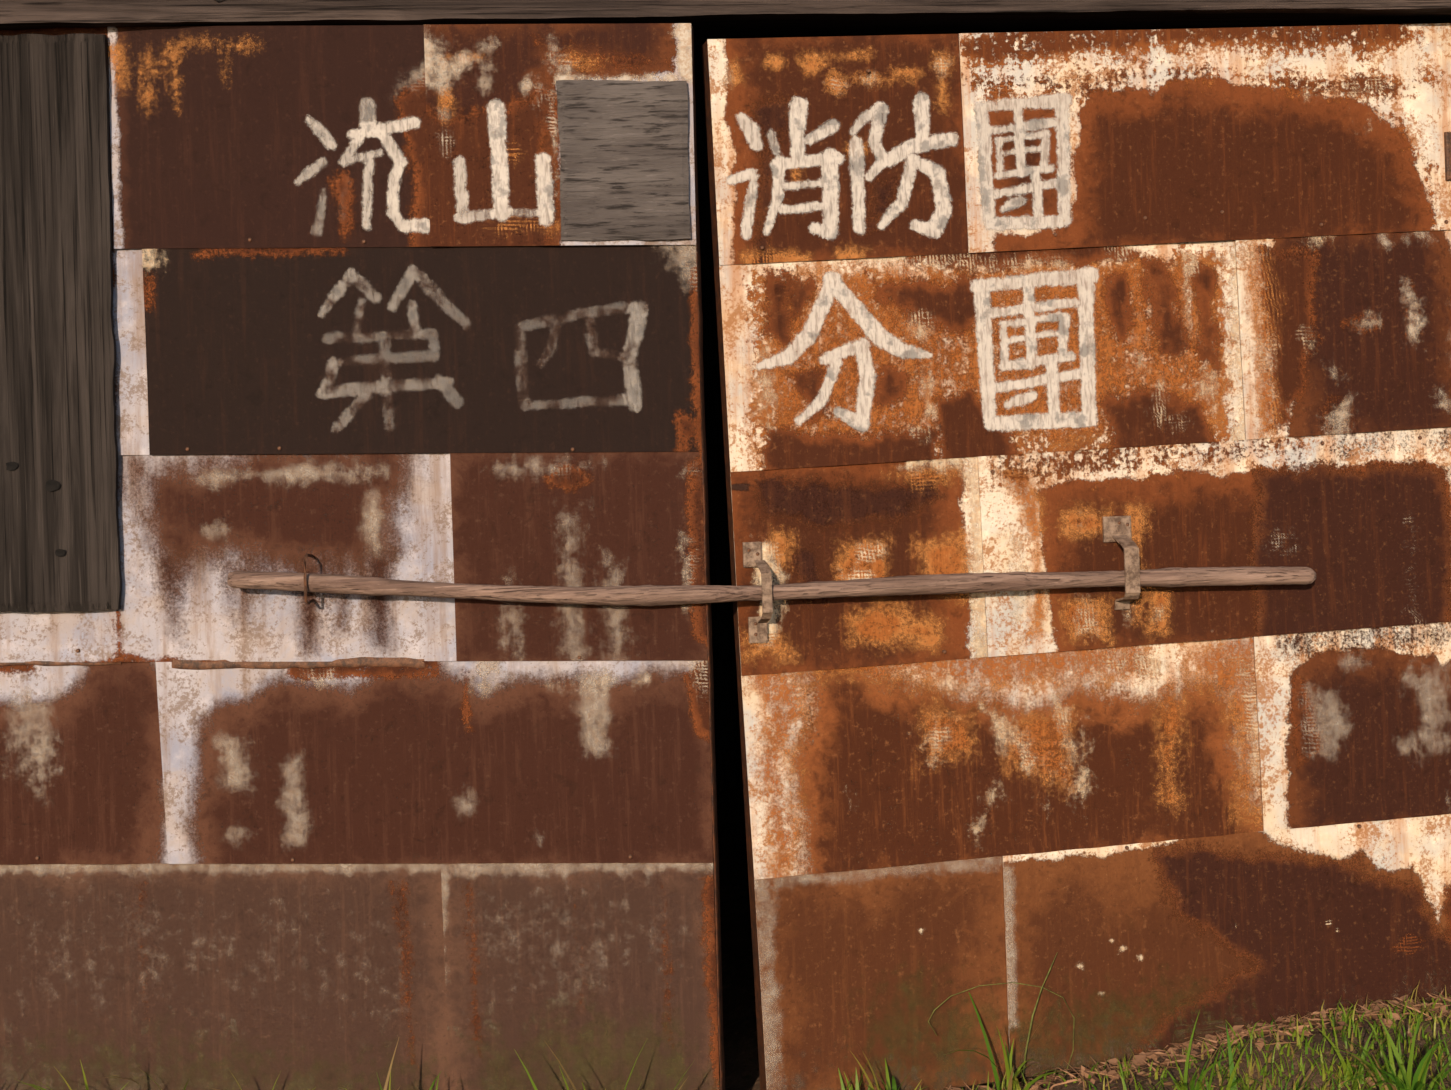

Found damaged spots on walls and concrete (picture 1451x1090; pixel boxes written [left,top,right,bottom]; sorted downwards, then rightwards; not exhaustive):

corrosion [0,23,720,1090]
corrosion [723,24,1451,1090]